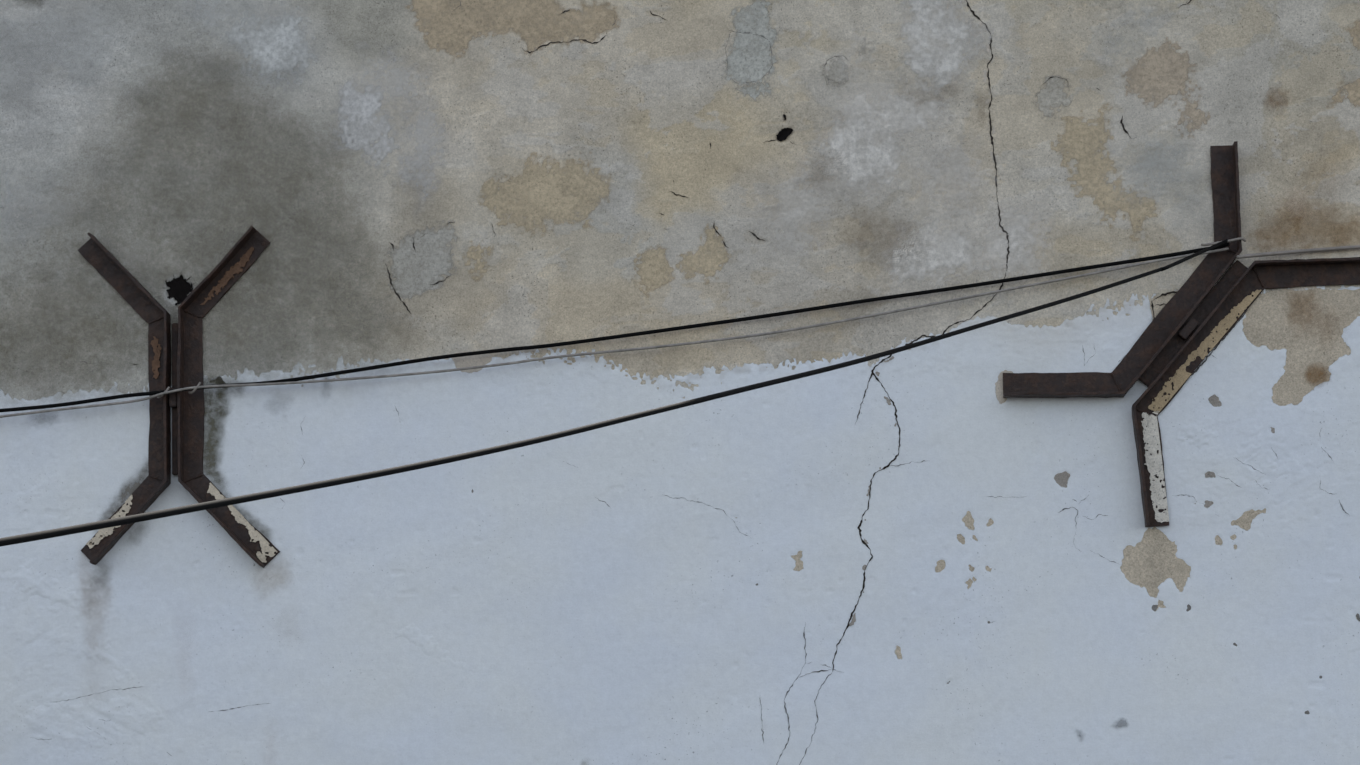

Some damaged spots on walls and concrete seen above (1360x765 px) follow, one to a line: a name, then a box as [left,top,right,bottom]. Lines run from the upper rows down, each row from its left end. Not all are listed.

leakage [338,70,437,186]
flaking render [722,0,777,100]
flaking render [763,114,793,144]
flaking render [1051,107,1157,241]
flaking render [1125,41,1210,136]
peeling [165,247,254,305]
flaking render [388,221,457,299]
peeling [452,350,493,373]
crack [760,0,1010,765]
peeling [1120,288,1360,611]
peeling [957,511,994,544]
crack [1062,497,1116,563]